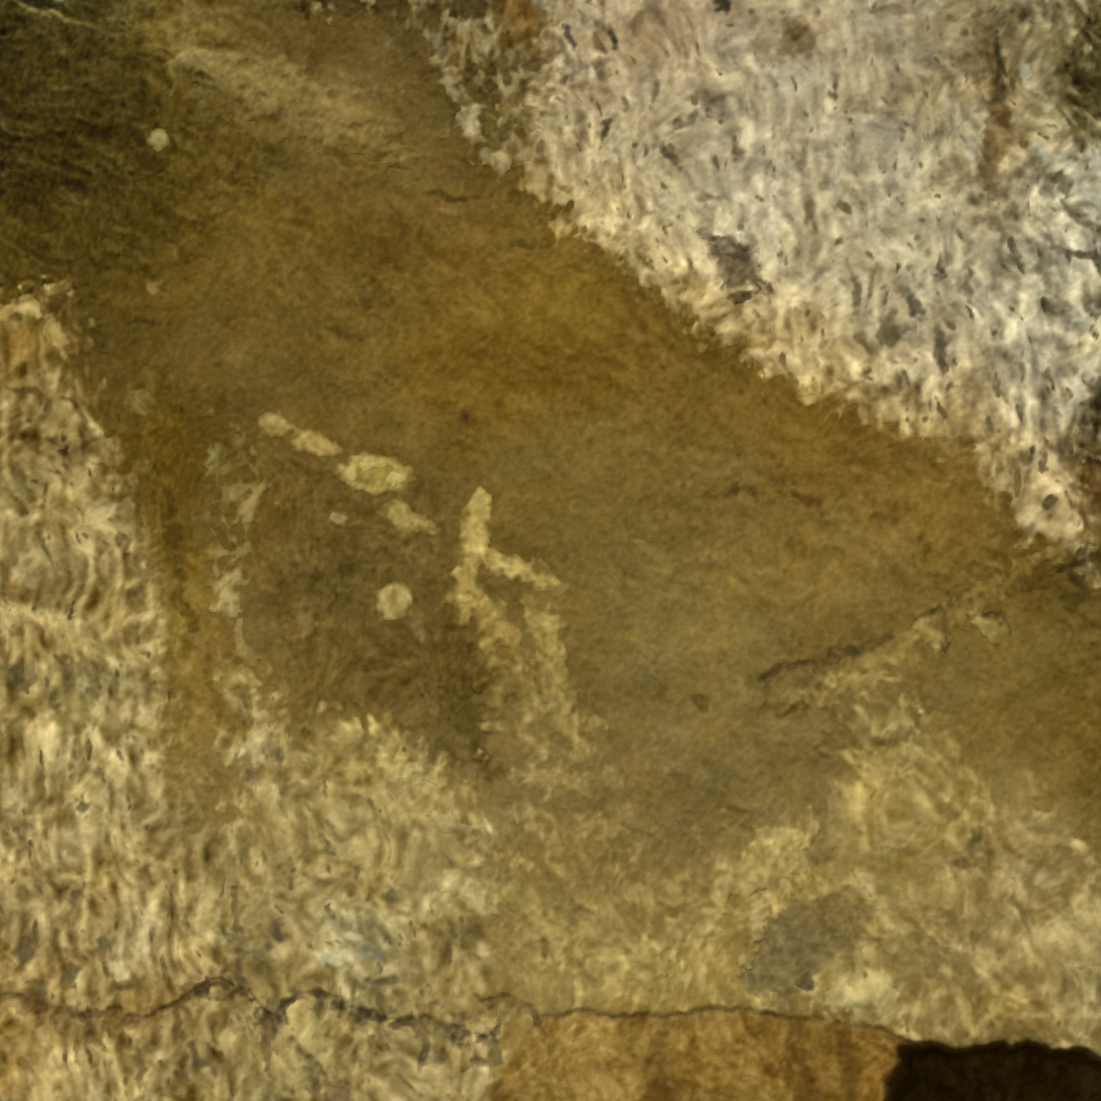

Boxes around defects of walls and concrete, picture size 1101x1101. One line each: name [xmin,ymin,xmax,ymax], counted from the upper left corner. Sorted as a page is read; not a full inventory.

crack [0,884,548,1095]